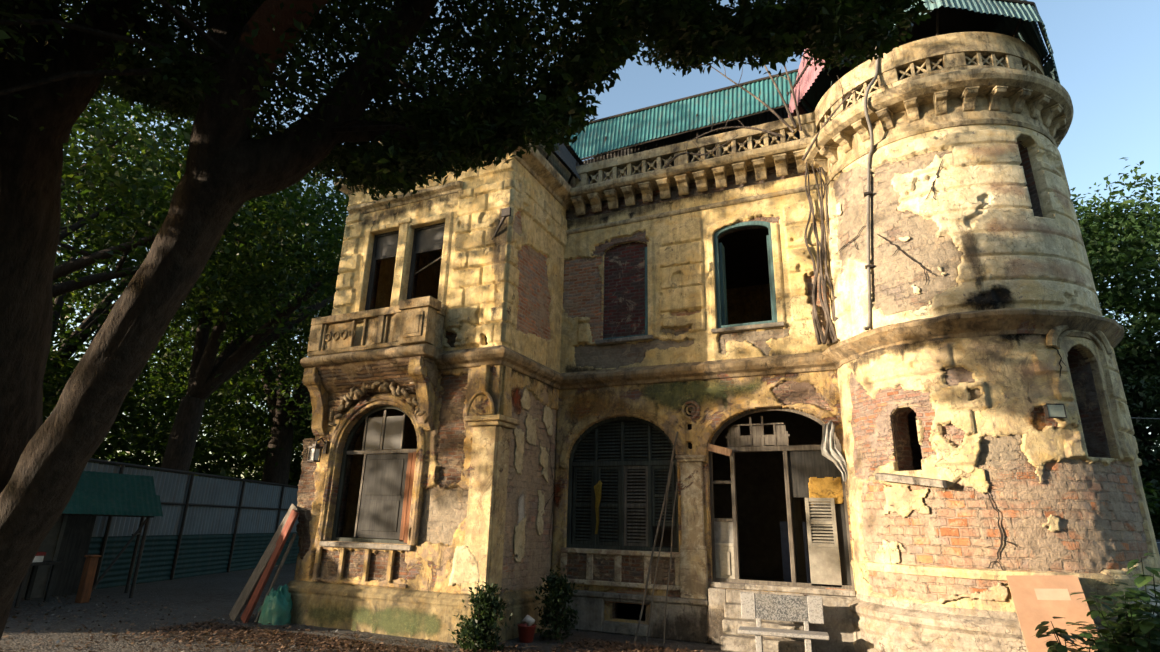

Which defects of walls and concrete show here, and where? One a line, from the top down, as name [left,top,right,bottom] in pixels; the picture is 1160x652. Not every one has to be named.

flaking render [296,438,409,581]
flaking render [418,373,469,546]
flaking render [501,387,557,591]
flaking render [513,211,701,369]
damp [643,380,759,412]
flaking render [718,327,790,356]
flaking render [805,273,832,344]
flaking render [833,149,963,316]
crack [925,159,944,200]
damp [962,232,1014,311]
flaking render [849,367,1148,604]
crack [986,492,1018,571]